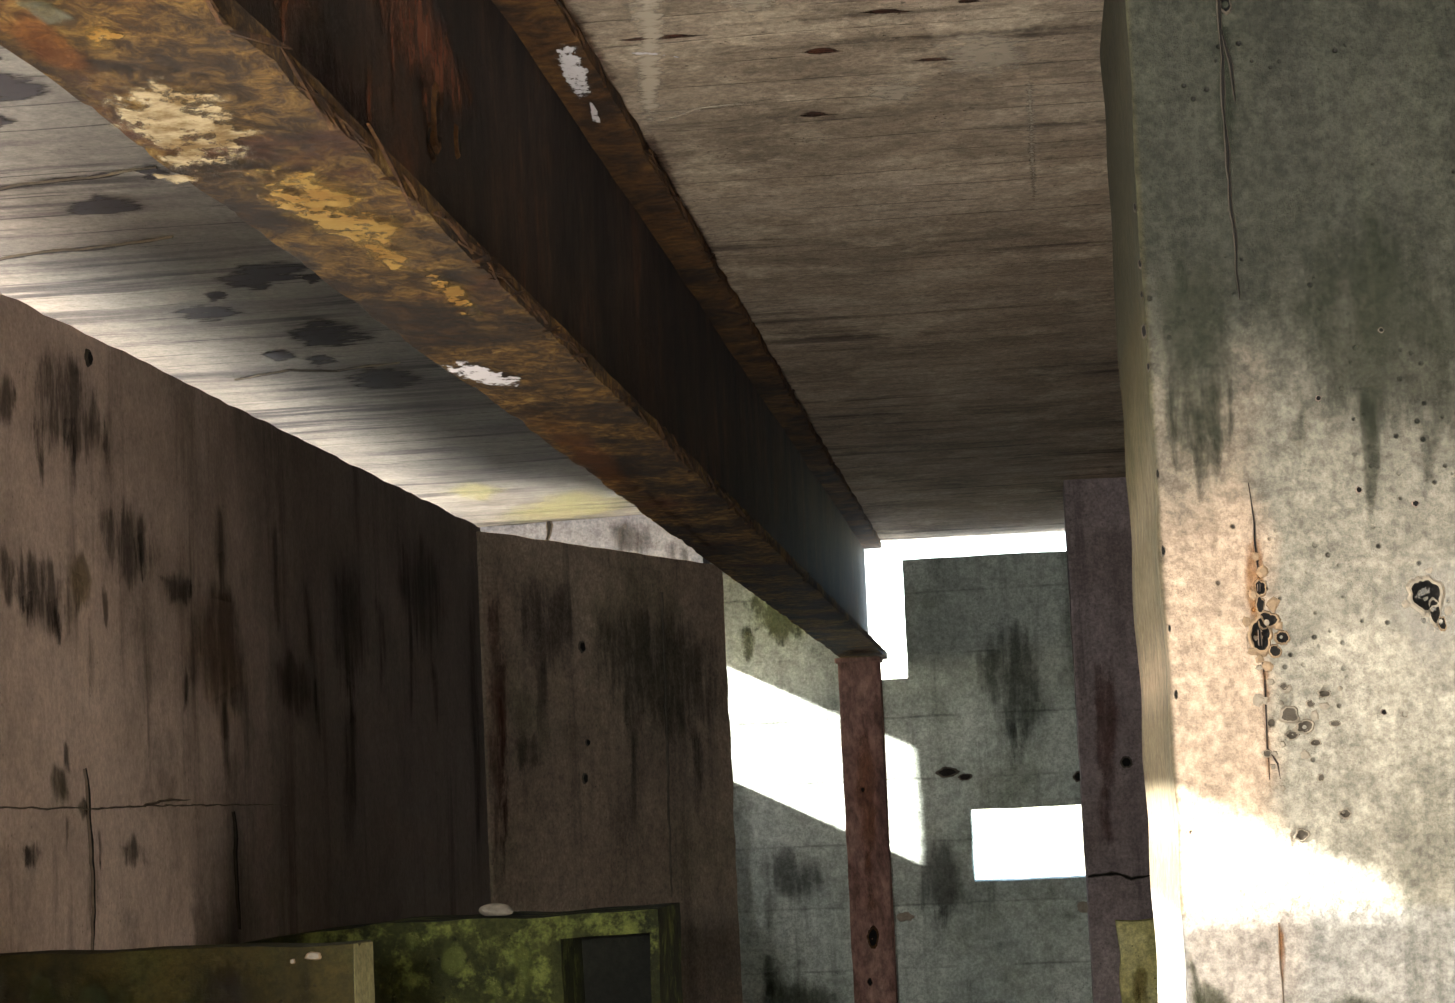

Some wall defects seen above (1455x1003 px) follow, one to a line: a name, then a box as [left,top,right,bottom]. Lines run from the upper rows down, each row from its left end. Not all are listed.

corrosion [280,0,363,126]
damp [0,377,16,420]
damp [38,357,108,481]
peeling [443,361,521,387]
damp [1363,399,1378,500]
damp [2,551,70,641]
damp [106,505,152,588]
spalling [1401,567,1452,631]
damp [185,593,242,752]
spalling [1242,552,1343,792]
crack [0,768,287,950]
spalling [1294,828,1310,842]